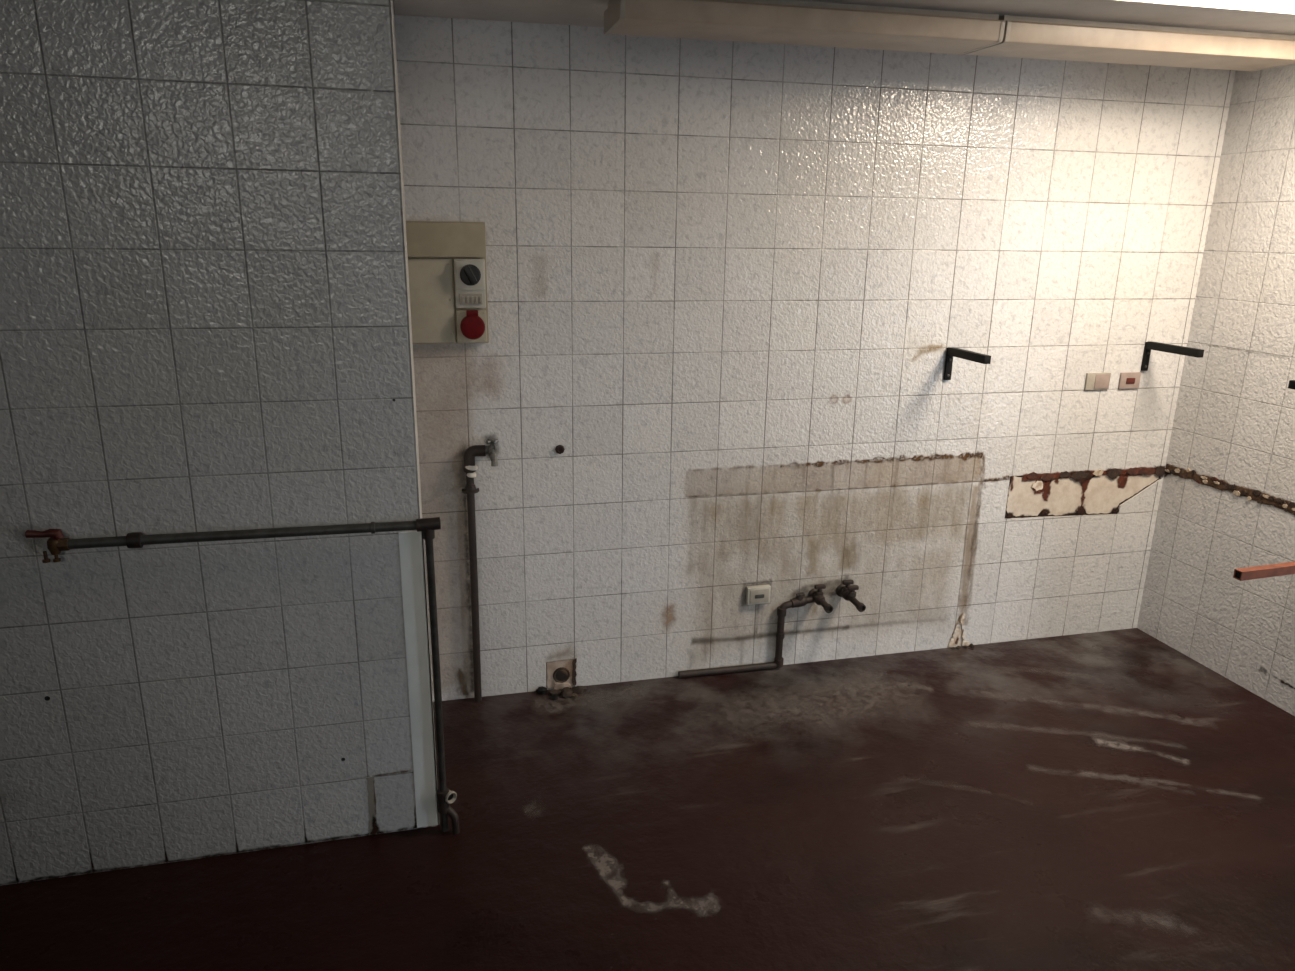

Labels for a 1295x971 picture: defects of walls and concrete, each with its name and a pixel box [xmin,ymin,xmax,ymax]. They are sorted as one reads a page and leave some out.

spalling [1005,474,1159,519]